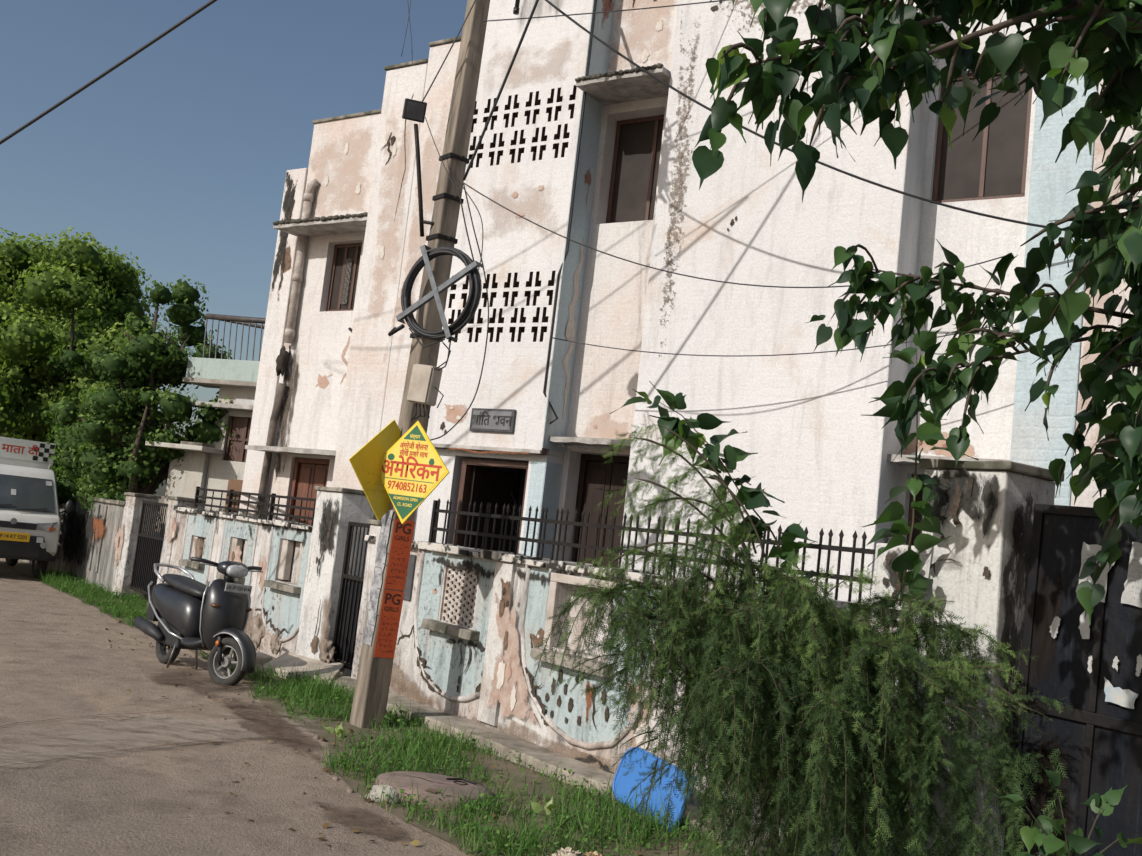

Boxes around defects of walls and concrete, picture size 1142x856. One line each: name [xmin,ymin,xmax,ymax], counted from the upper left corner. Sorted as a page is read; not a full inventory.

damp [272,171,297,301]
peeling [316,336,350,389]
damp [274,345,299,478]
damp [193,499,339,576]
mould [929,468,998,538]
peeling [475,578,544,725]
peeling [545,669,580,725]